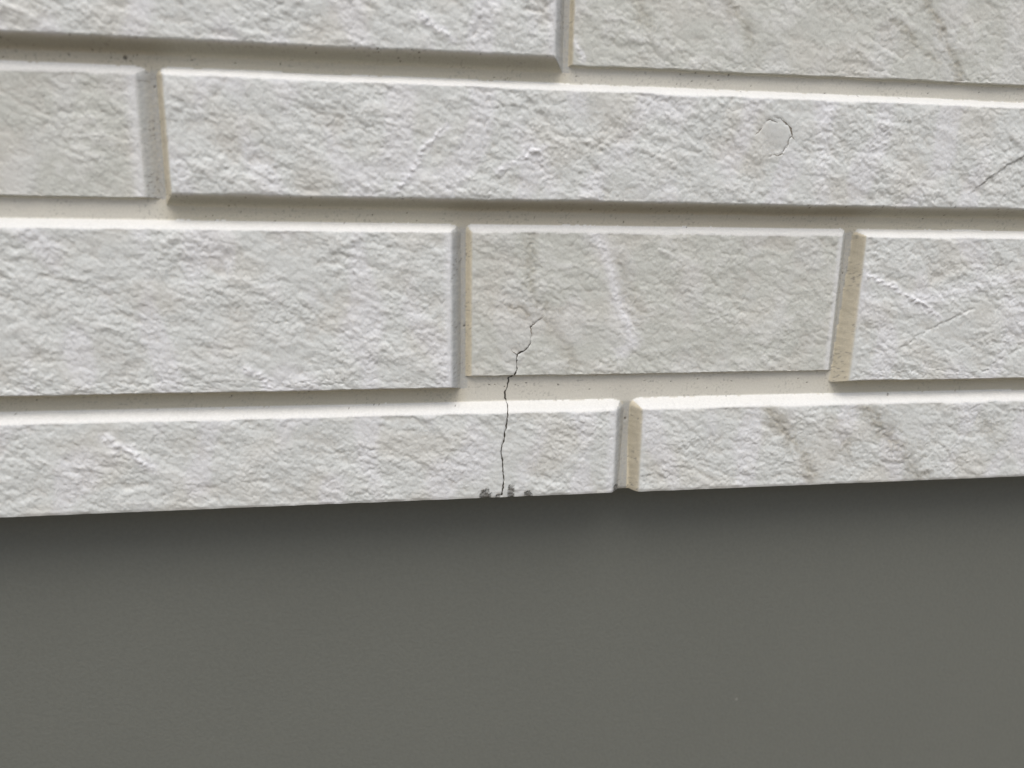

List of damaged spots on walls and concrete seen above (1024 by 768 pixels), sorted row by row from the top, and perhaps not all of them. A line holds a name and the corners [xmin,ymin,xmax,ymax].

crack [501,315,545,495]